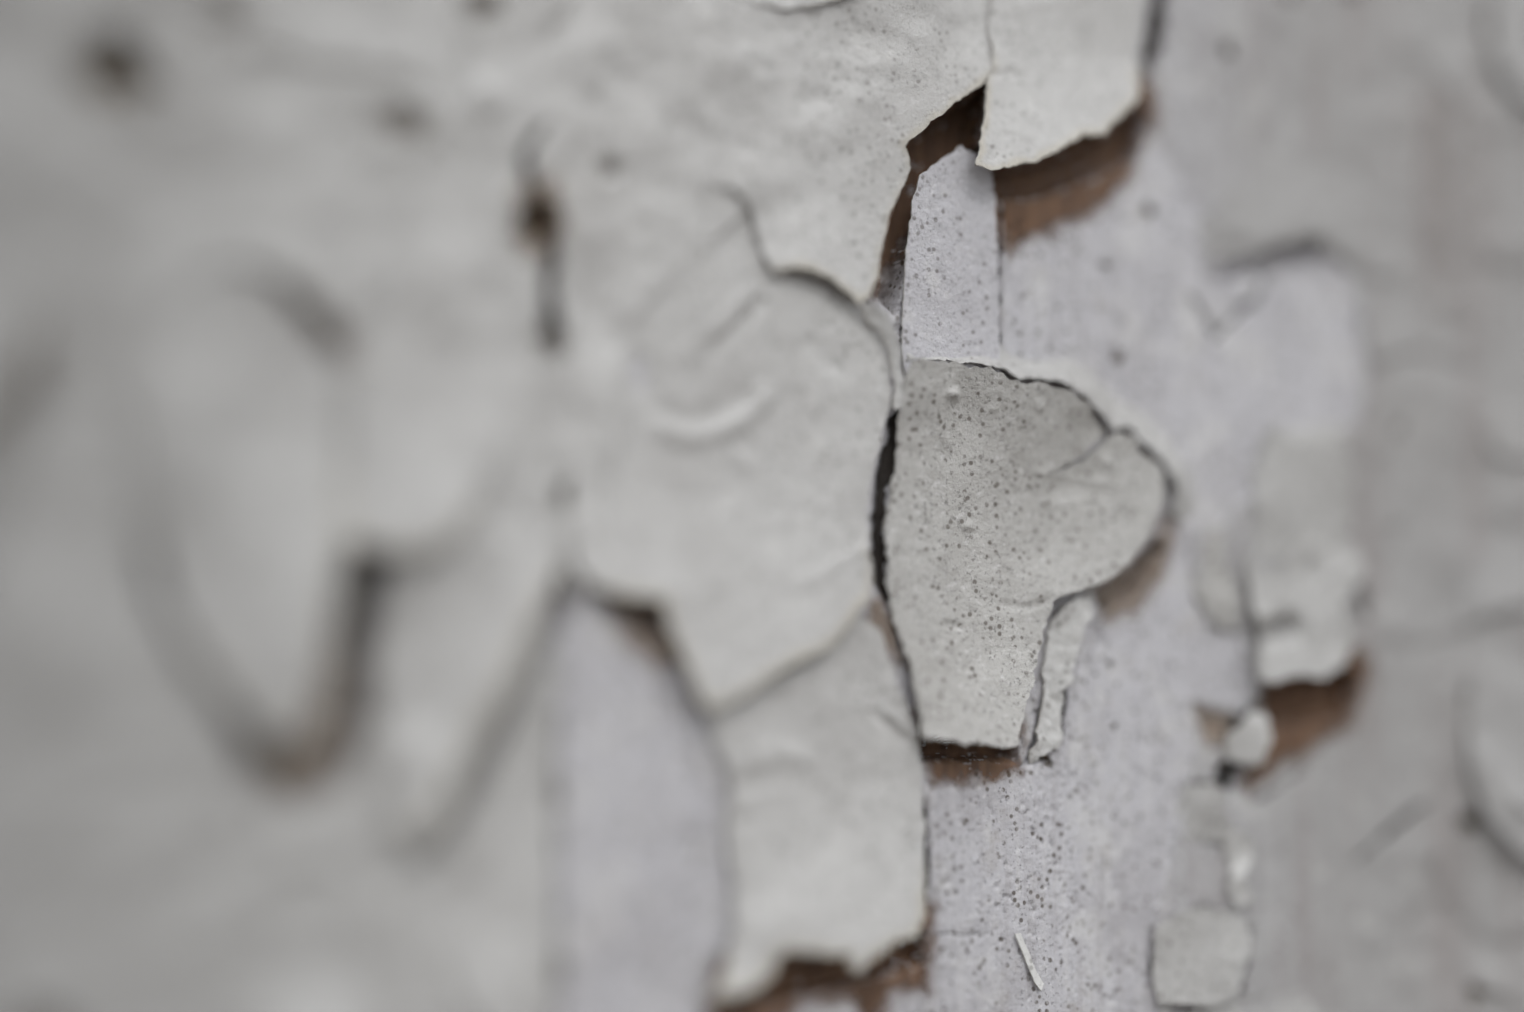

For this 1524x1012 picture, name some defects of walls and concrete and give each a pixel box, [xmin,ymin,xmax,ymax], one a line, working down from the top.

crack [996,210,1004,344]
peeling [1199,150,1370,262]
peeling [89,0,1165,1000]
peeling [1186,525,1365,684]
peeling [1225,710,1273,765]
peeling [1152,782,1254,1006]